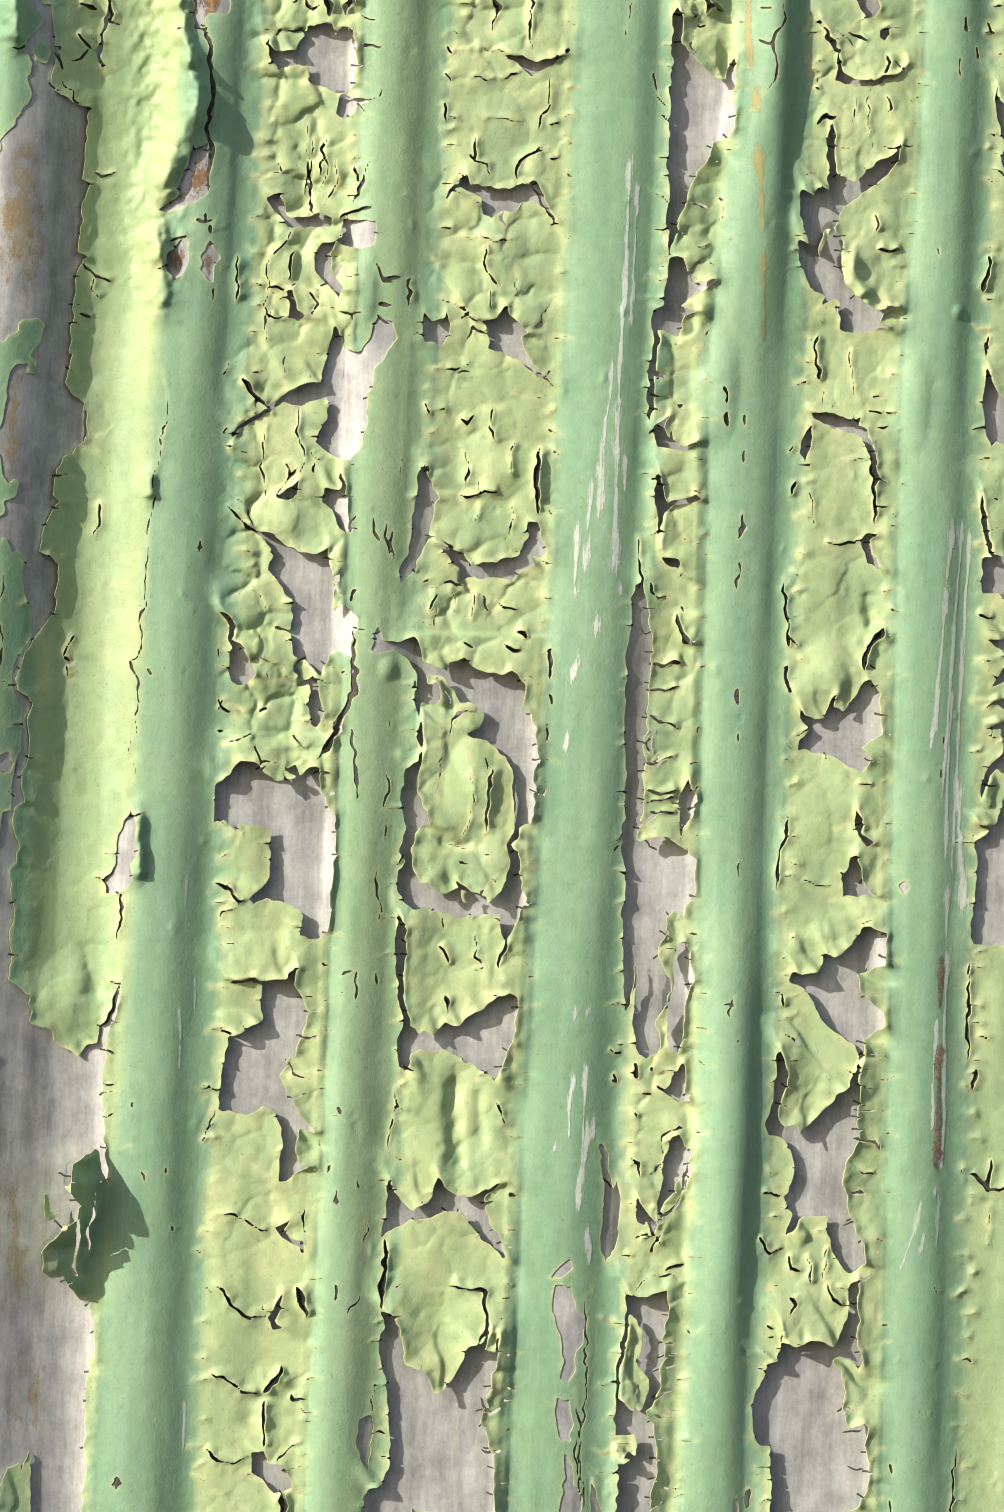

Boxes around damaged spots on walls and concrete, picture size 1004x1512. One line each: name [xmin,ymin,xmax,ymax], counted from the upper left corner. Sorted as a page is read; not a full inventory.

corrosion [196,0,220,17]
crack [491,0,499,24]
crack [470,95,559,168]
peeling [780,0,926,361]
crack [424,403,540,528]
crack [0,575,8,665]
peeling [142,0,569,1267]
peeling [0,0,139,1512]
peeling [339,0,758,1512]
corrosion [936,956,946,1008]
peeling [726,655,915,1512]
corrosion [932,1044,946,1169]